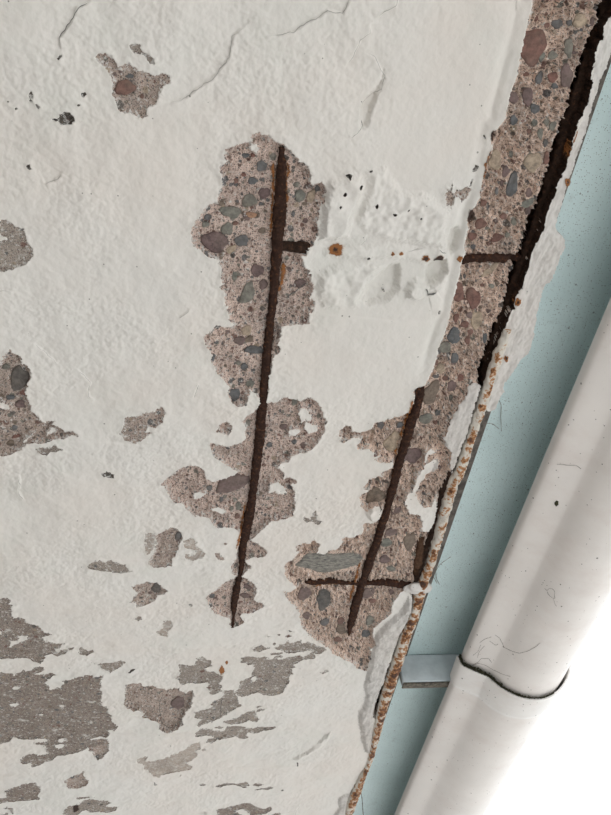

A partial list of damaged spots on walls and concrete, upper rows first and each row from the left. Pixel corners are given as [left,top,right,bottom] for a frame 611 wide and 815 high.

peeling [96,44,170,119]
peeling [0,220,33,272]
corrosion [328,243,343,256]
corrosion [457,253,521,264]
spalling [0,349,78,457]
corrosion [230,147,311,628]
spalling [119,0,611,785]
corrosion [305,386,425,636]
peeling [0,598,135,767]
peeling [0,782,41,815]
peeling [63,771,117,815]
peeling [216,803,281,815]